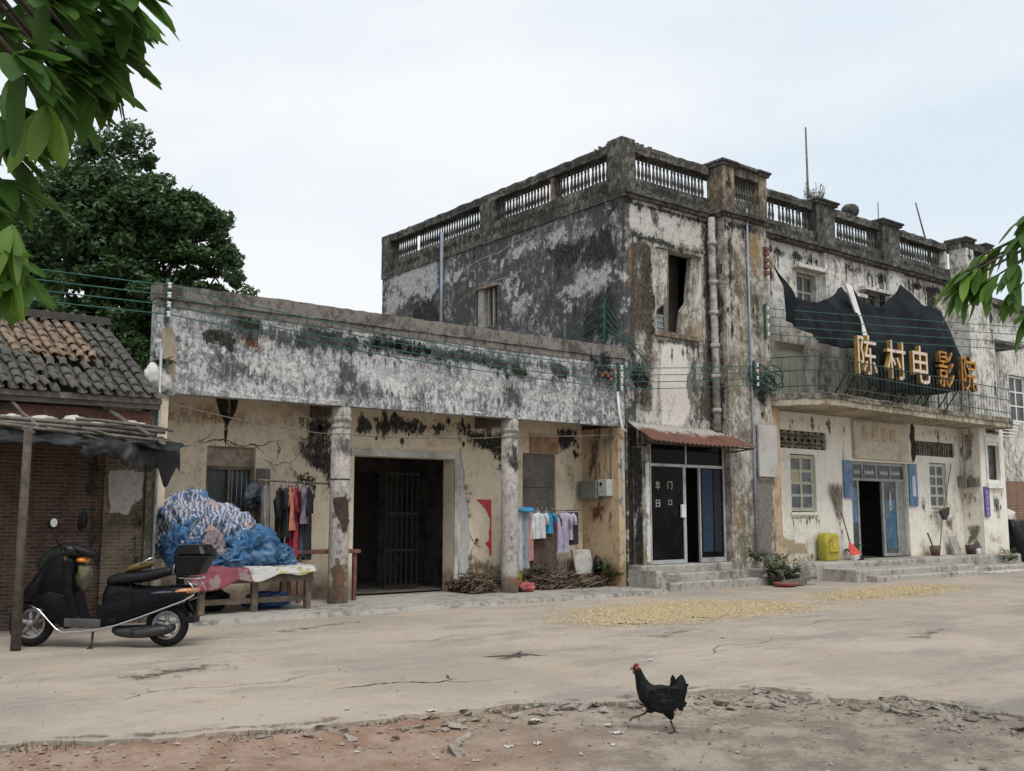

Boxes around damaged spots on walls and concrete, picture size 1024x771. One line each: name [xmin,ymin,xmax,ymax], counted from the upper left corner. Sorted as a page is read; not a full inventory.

water stain [390,233,480,271]
water stain [409,296,440,322]
water stain [494,184,818,565]
water stain [168,313,603,501]
crack [198,434,304,471]
spalling [332,493,351,532]